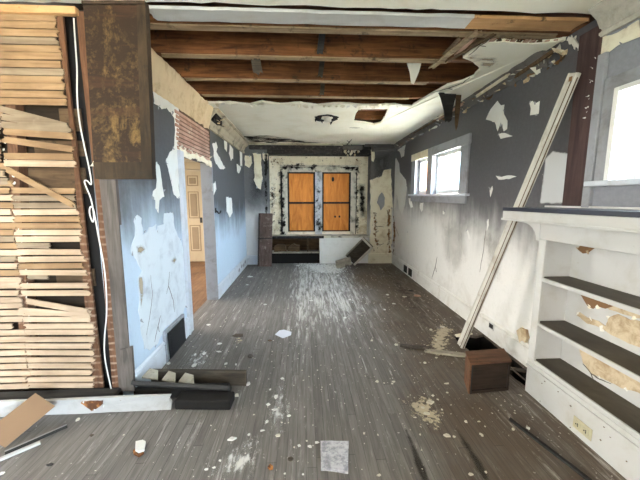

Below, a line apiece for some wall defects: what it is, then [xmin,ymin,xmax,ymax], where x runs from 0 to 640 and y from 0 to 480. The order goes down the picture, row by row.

peeling [511,35,579,87]
peeling [529,101,540,116]
peeling [369,126,437,253]
peeling [540,151,567,203]
peeling [131,92,268,350]